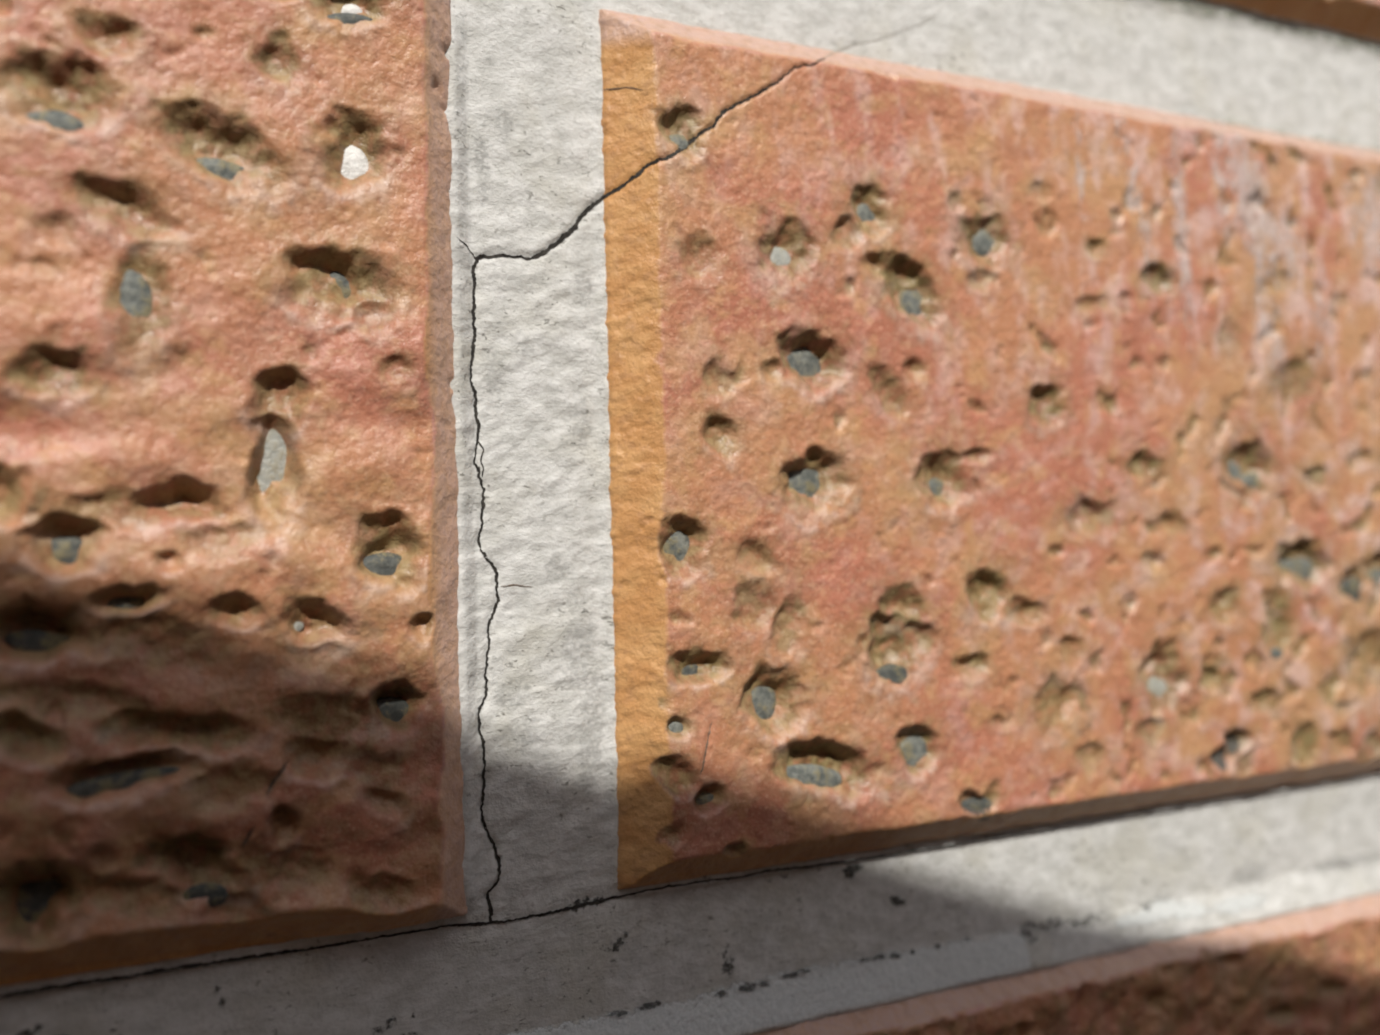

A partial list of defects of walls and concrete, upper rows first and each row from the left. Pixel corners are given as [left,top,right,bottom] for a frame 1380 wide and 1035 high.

crack [457,16,935,921]
crack [242,761,288,848]
crack [0,803,1206,998]